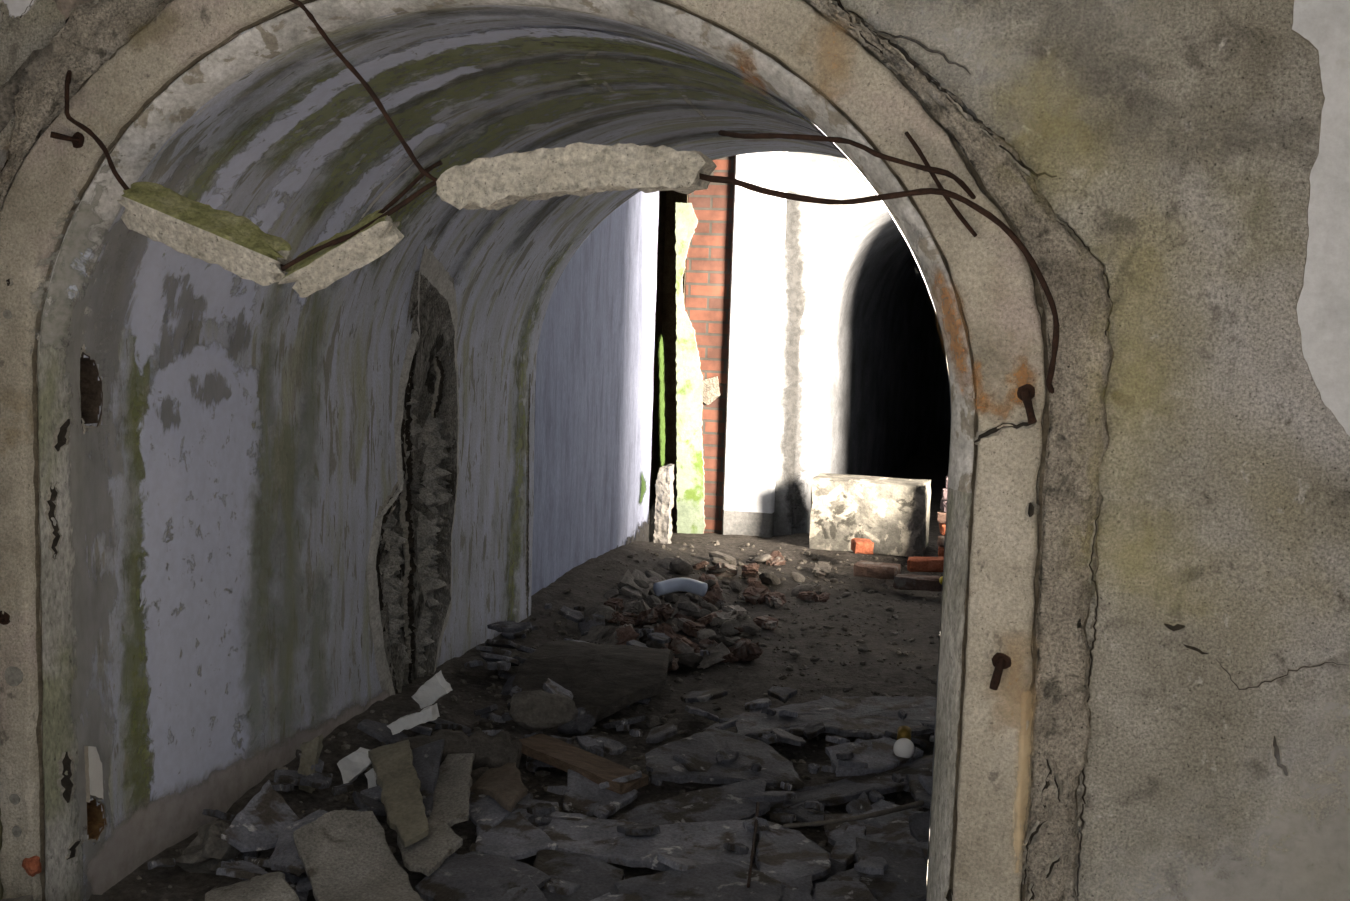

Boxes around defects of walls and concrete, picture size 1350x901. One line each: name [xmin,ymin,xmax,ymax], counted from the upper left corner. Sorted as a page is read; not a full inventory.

peeling [2,0,35,18]
spalling [0,45,57,133]
leakage [185,12,839,248]
crack [828,0,1057,180]
leakage [508,242,573,622]
leakage [781,193,809,529]
corrosion [934,273,1035,418]
crack [973,420,1036,445]
crack [1055,214,1111,406]
peeling [30,155,148,901]
crack [1183,643,1350,691]